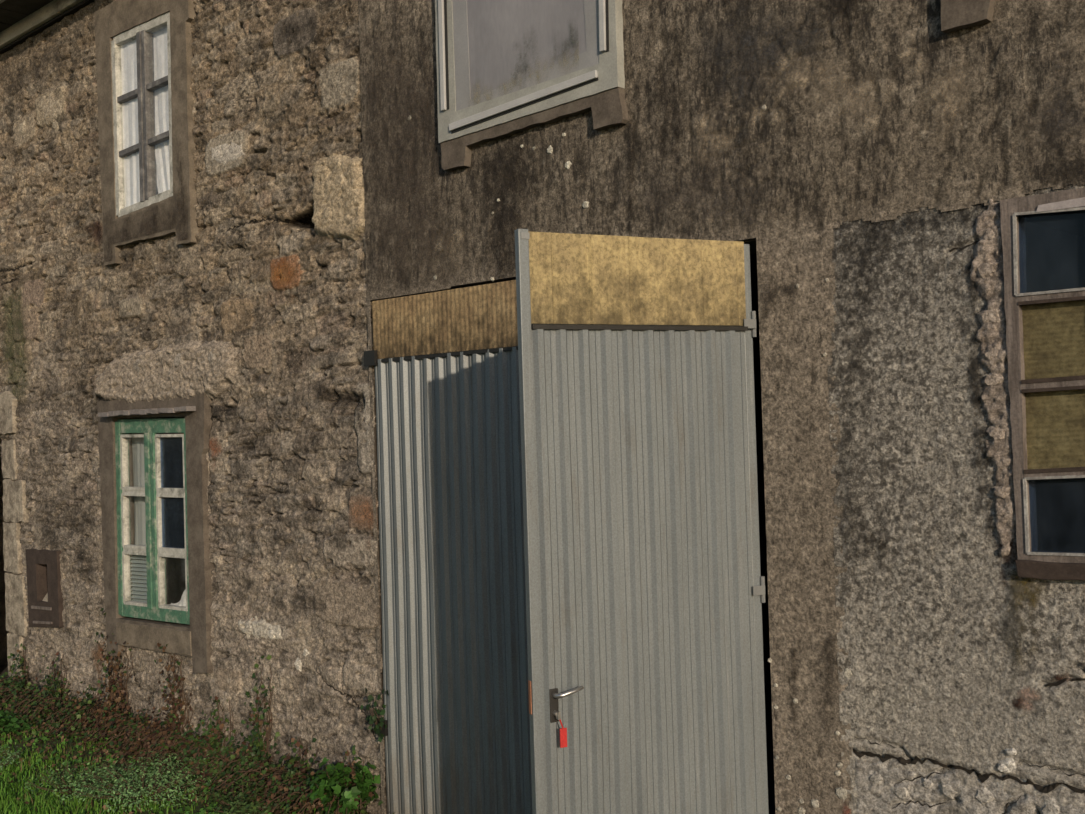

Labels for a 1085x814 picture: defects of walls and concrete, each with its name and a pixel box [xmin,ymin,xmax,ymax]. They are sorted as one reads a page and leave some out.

spalling [970,198,1016,557]
crack [853,737,1085,814]